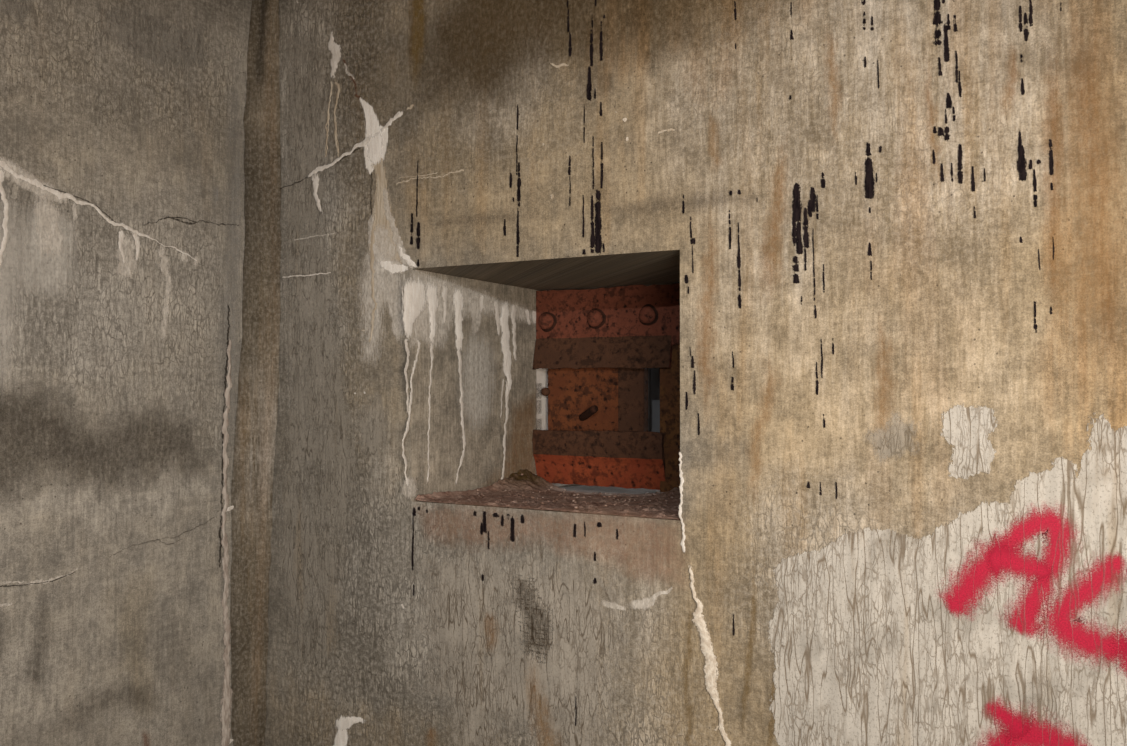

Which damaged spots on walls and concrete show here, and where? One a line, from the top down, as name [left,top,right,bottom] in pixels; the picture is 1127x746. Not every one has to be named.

damp [1019,0,1033,41]
damp [0,157,198,366]
crack [147,217,238,226]
crack [280,104,414,211]
damp [325,32,536,571]
damp [441,0,737,255]
damp [792,172,826,318]
damp [1017,130,1054,207]
crack [219,305,234,746]
crack [678,452,732,746]
peeling [768,405,1127,746]
spalling [333,715,363,746]